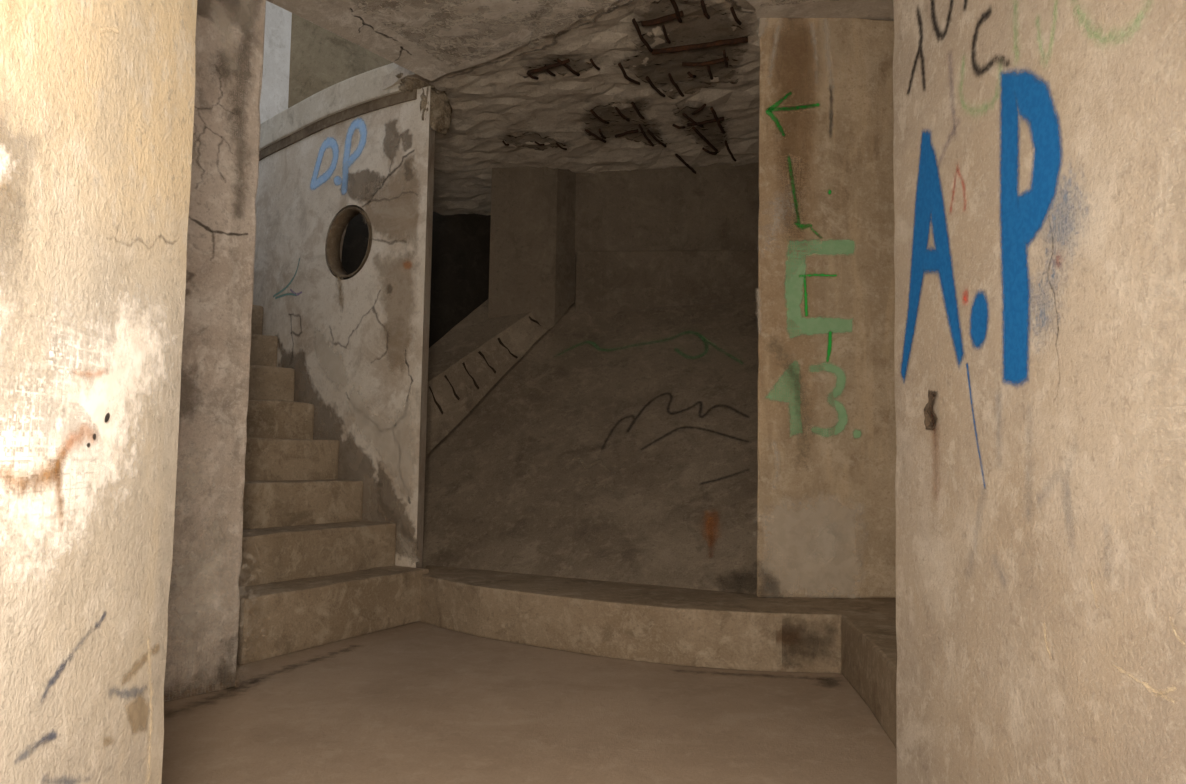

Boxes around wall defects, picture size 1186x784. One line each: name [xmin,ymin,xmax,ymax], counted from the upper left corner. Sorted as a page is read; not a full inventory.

spalling [449,2,630,80]
spalling [632,0,753,80]
spalling [618,63,684,97]
spalling [585,102,696,174]
spalling [672,104,736,162]
crack [362,150,414,207]
crack [193,220,248,235]
rust [9,452,64,508]
damp [0,294,174,582]
damp [277,336,417,559]